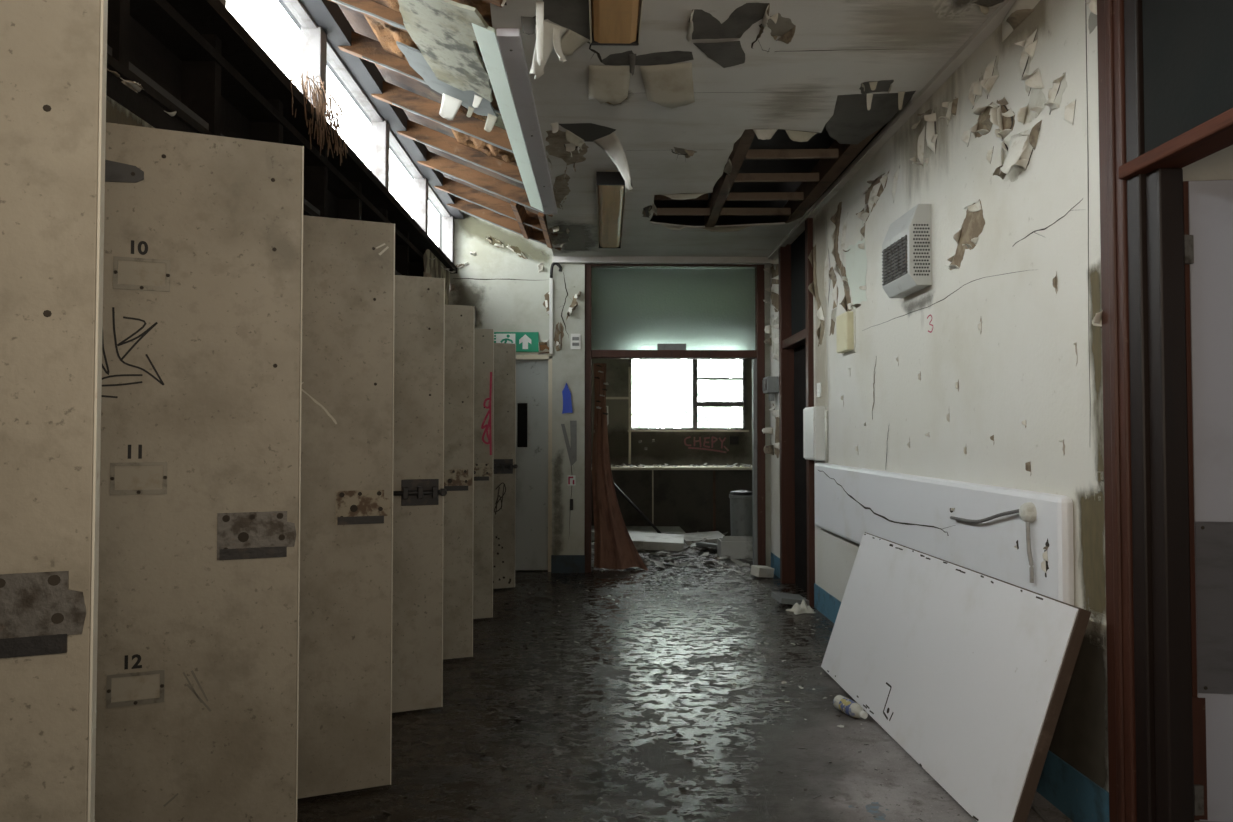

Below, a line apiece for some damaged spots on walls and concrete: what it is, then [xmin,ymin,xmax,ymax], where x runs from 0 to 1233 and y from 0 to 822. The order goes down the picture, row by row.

peeling [521,0,592,80]
peeling [588,3,796,109]
peeling [548,225,570,247]
peeling [546,122,633,210]
peeling [808,27,1076,346]
crack [865,0,1090,461]
peeling [538,291,581,353]